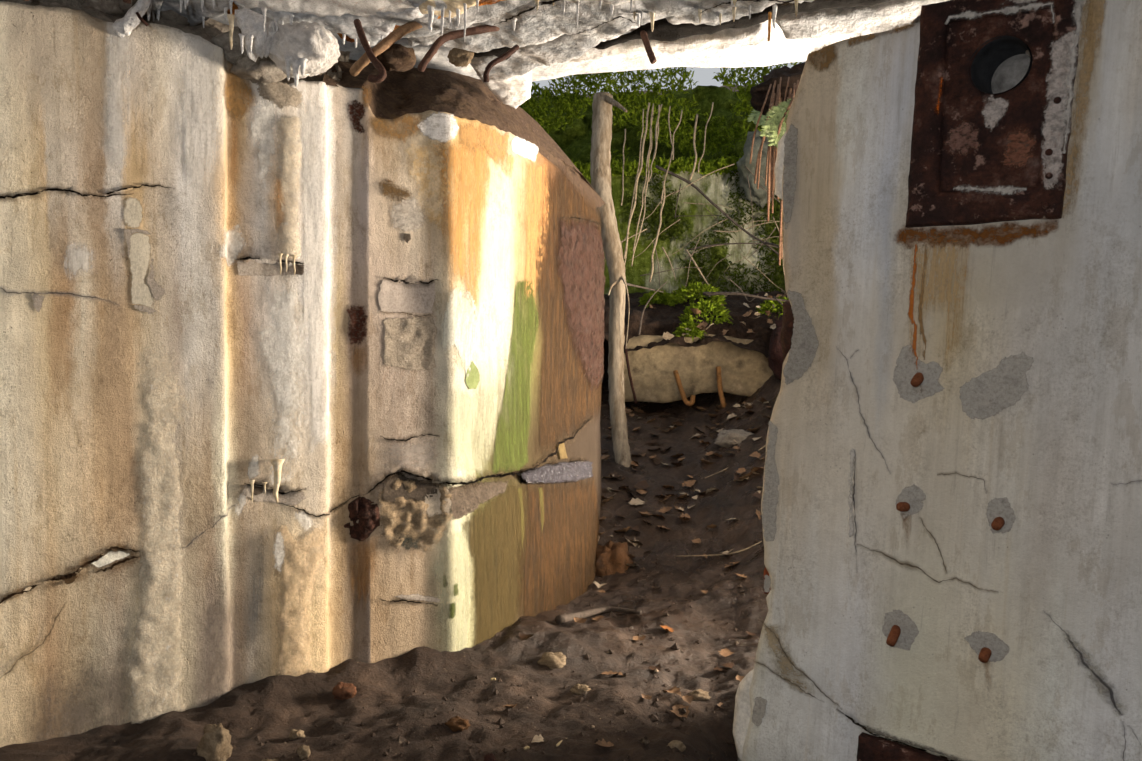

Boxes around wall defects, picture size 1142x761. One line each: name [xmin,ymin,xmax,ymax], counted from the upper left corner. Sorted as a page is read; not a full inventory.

water stain [180,0,480,87]
spalling [396,0,950,109]
water stain [806,32,876,72]
water stain [1041,32,1078,189]
crack [0,184,171,201]
corrosion [897,0,1105,365]
water stain [536,169,606,451]
spalling [893,345,944,403]
corrosion [344,496,380,596]
spalling [378,473,508,552]
crack [0,544,141,675]
crack [1047,614,1138,760]